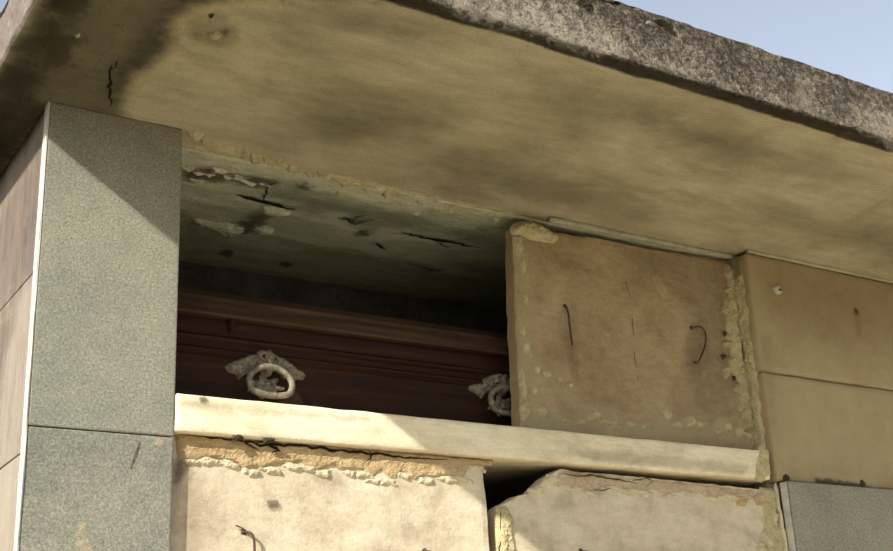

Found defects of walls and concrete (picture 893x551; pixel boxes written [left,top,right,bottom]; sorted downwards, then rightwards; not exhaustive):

water stain [0,0,201,172]
crack [106,60,118,107]
water stain [386,0,893,152]
peeling [182,165,276,188]
peeling [192,206,292,238]
crack [338,215,373,225]
crack [401,232,480,248]
crack [183,434,447,463]
peeling [173,434,493,487]
peeling [527,471,788,551]